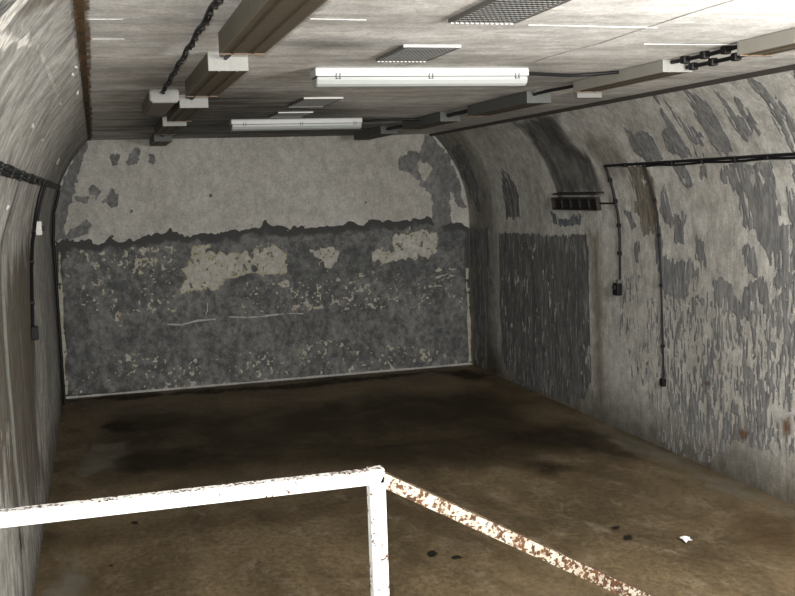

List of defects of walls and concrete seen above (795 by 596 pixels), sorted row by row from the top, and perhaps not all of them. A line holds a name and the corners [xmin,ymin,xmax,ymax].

peeling [55,134,592,404]
peeling [619,78,795,463]